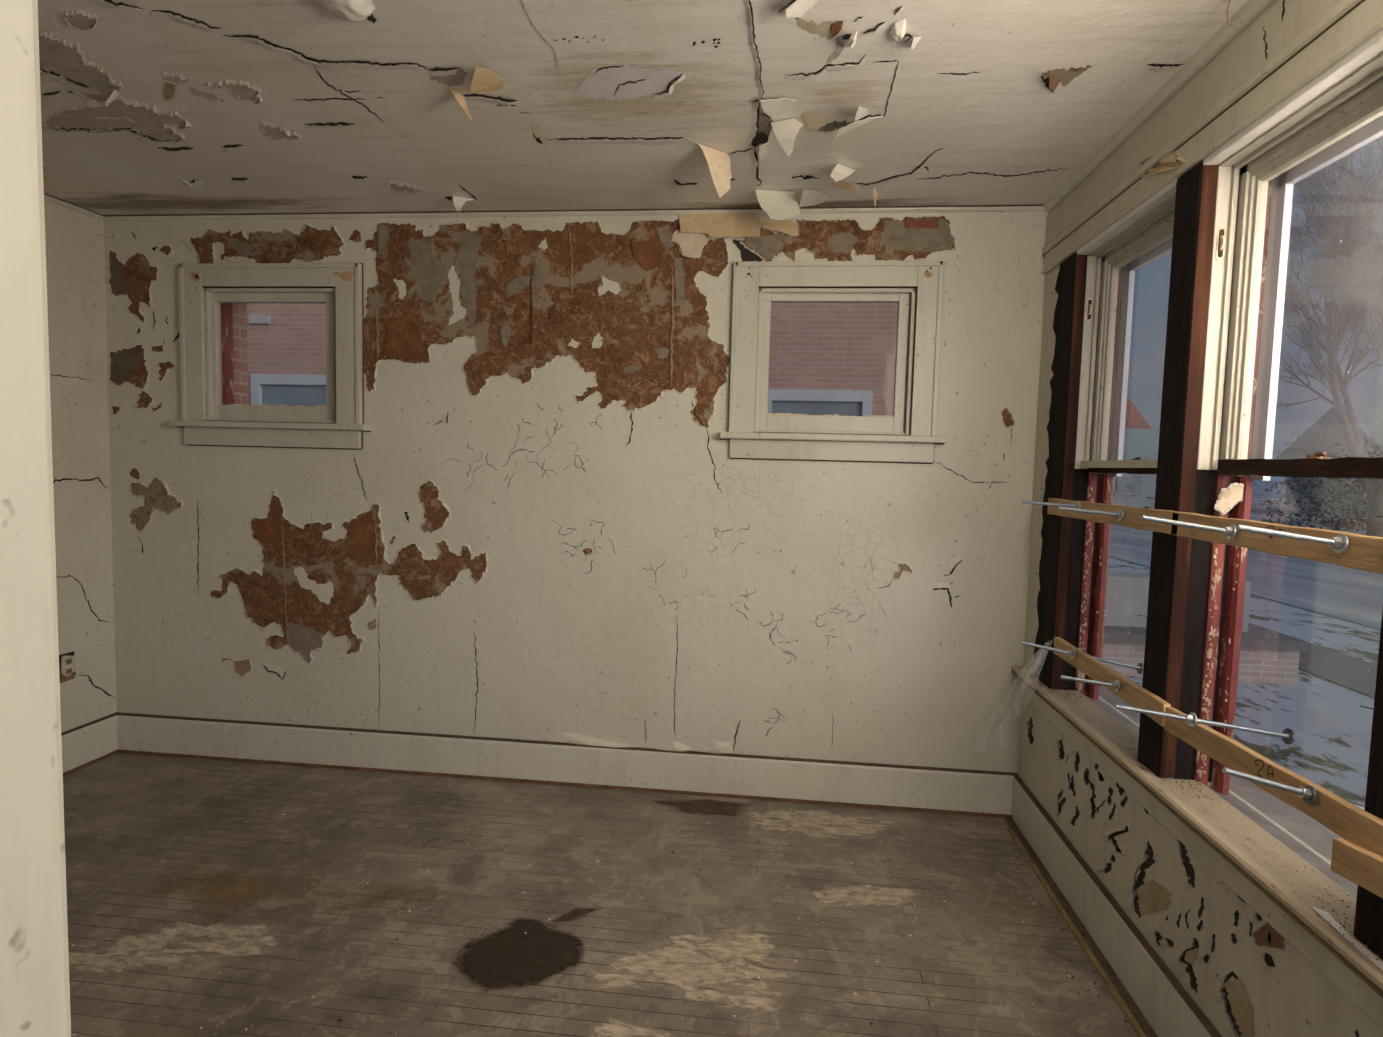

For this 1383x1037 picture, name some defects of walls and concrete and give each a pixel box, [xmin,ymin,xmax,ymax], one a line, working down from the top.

crack [89,0,685,146]
crack [743,0,899,117]
peeling [778,0,921,63]
peeling [106,98,956,430]
crack [53,477,111,489]
peeling [128,468,183,553]
crack [433,403,633,491]
crack [691,401,722,494]
peeling [209,478,489,680]
crack [553,520,750,743]
leakage [455,908,602,990]
peeling [1252,914,1304,952]